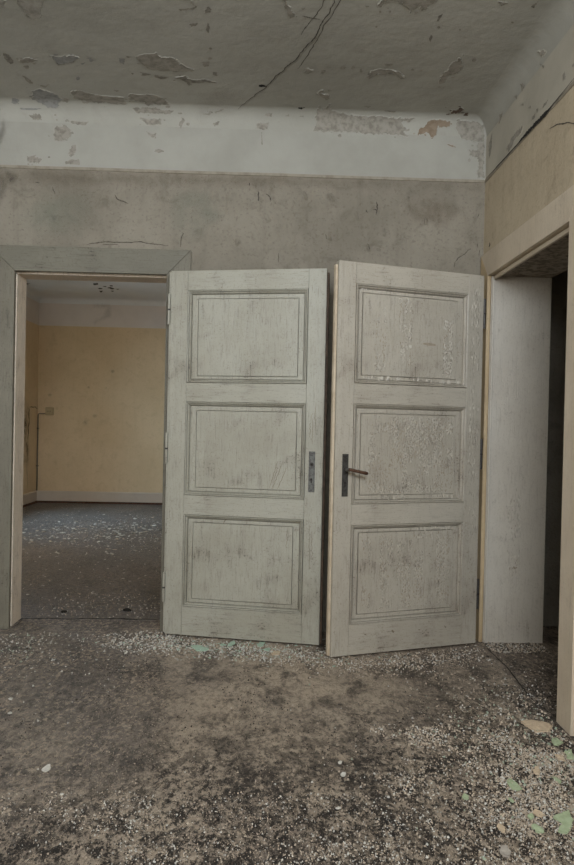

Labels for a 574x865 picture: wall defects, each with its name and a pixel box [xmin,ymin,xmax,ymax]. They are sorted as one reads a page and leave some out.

peeling [0,53,190,165]
peeling [119,48,217,86]
crack [238,0,341,110]
peeling [286,90,492,179]